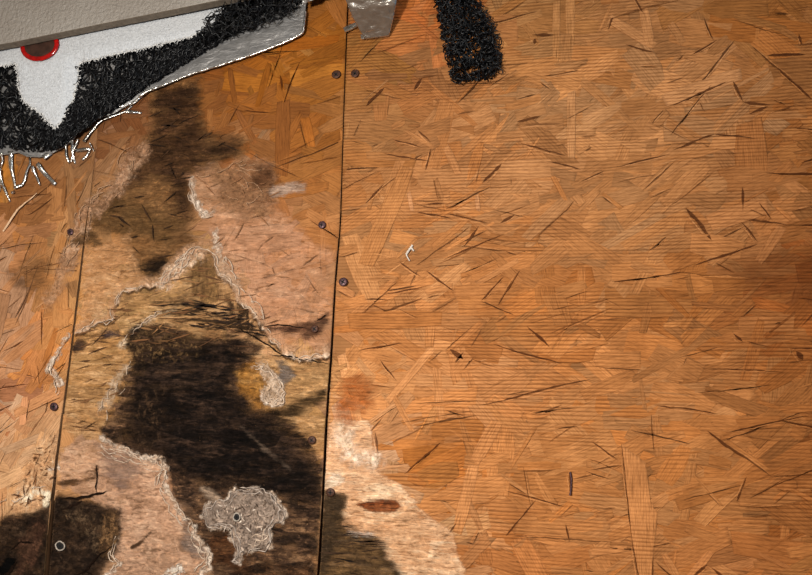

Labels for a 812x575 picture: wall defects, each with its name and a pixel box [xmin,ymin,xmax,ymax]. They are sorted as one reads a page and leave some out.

leakage [0,79,464,575]